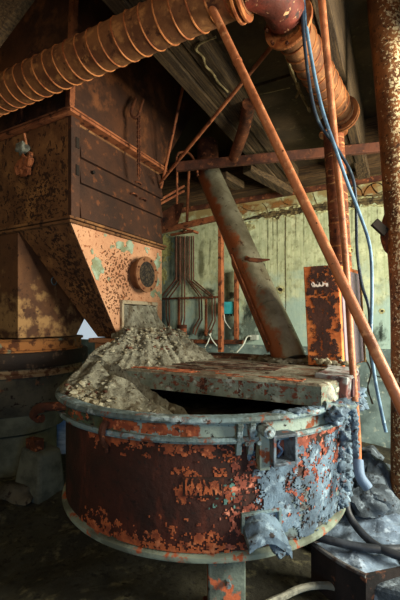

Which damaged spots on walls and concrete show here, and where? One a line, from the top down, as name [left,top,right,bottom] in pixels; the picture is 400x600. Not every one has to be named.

damp [232,305,258,341]